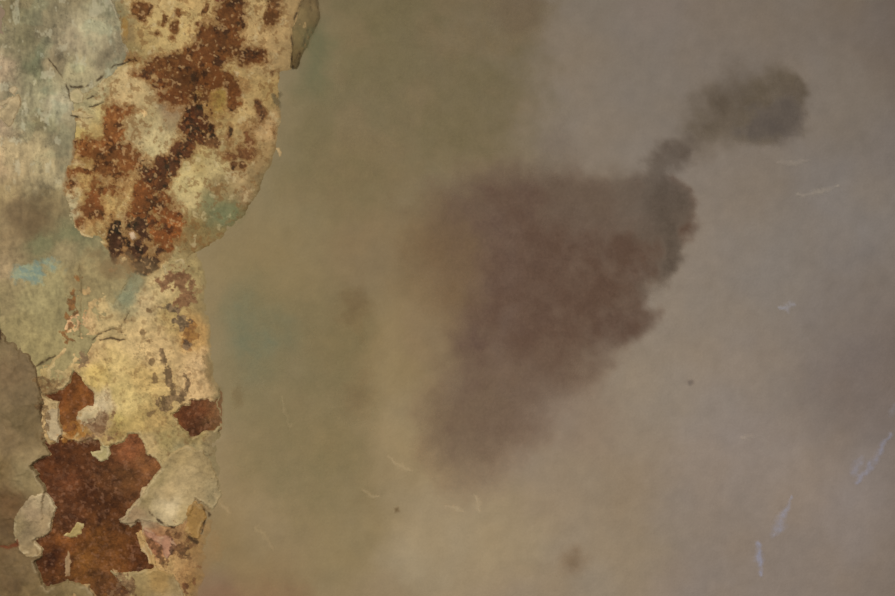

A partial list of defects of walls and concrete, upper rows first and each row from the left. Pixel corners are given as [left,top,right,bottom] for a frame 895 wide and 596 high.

corrosion [59,275,83,344]
corrosion [78,351,90,369]
peeling [0,0,320,596]
corrosion [63,0,284,351]
water stain [427,68,808,465]